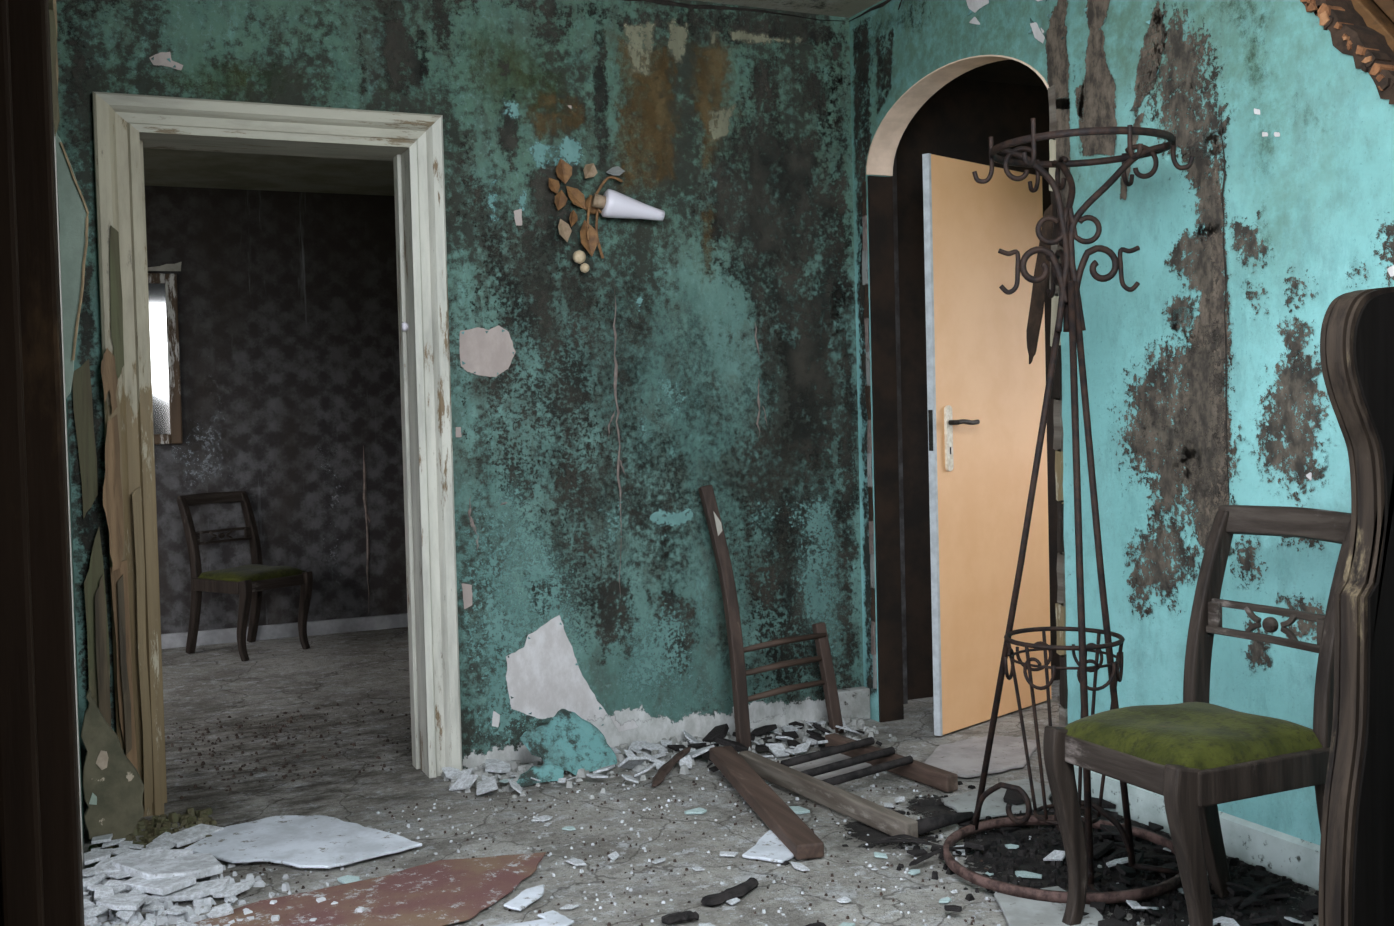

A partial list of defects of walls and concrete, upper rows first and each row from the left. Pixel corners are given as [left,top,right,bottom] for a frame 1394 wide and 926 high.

damp [355,0,478,95]
spalling [966,0,990,25]
spalling [488,180,527,226]
spalling [459,326,516,377]
damp [450,0,924,703]
peeling [1026,0,1331,619]
damp [70,261,116,728]
spalling [455,477,828,769]
peeling [756,490,852,669]
peeling [1229,535,1324,672]